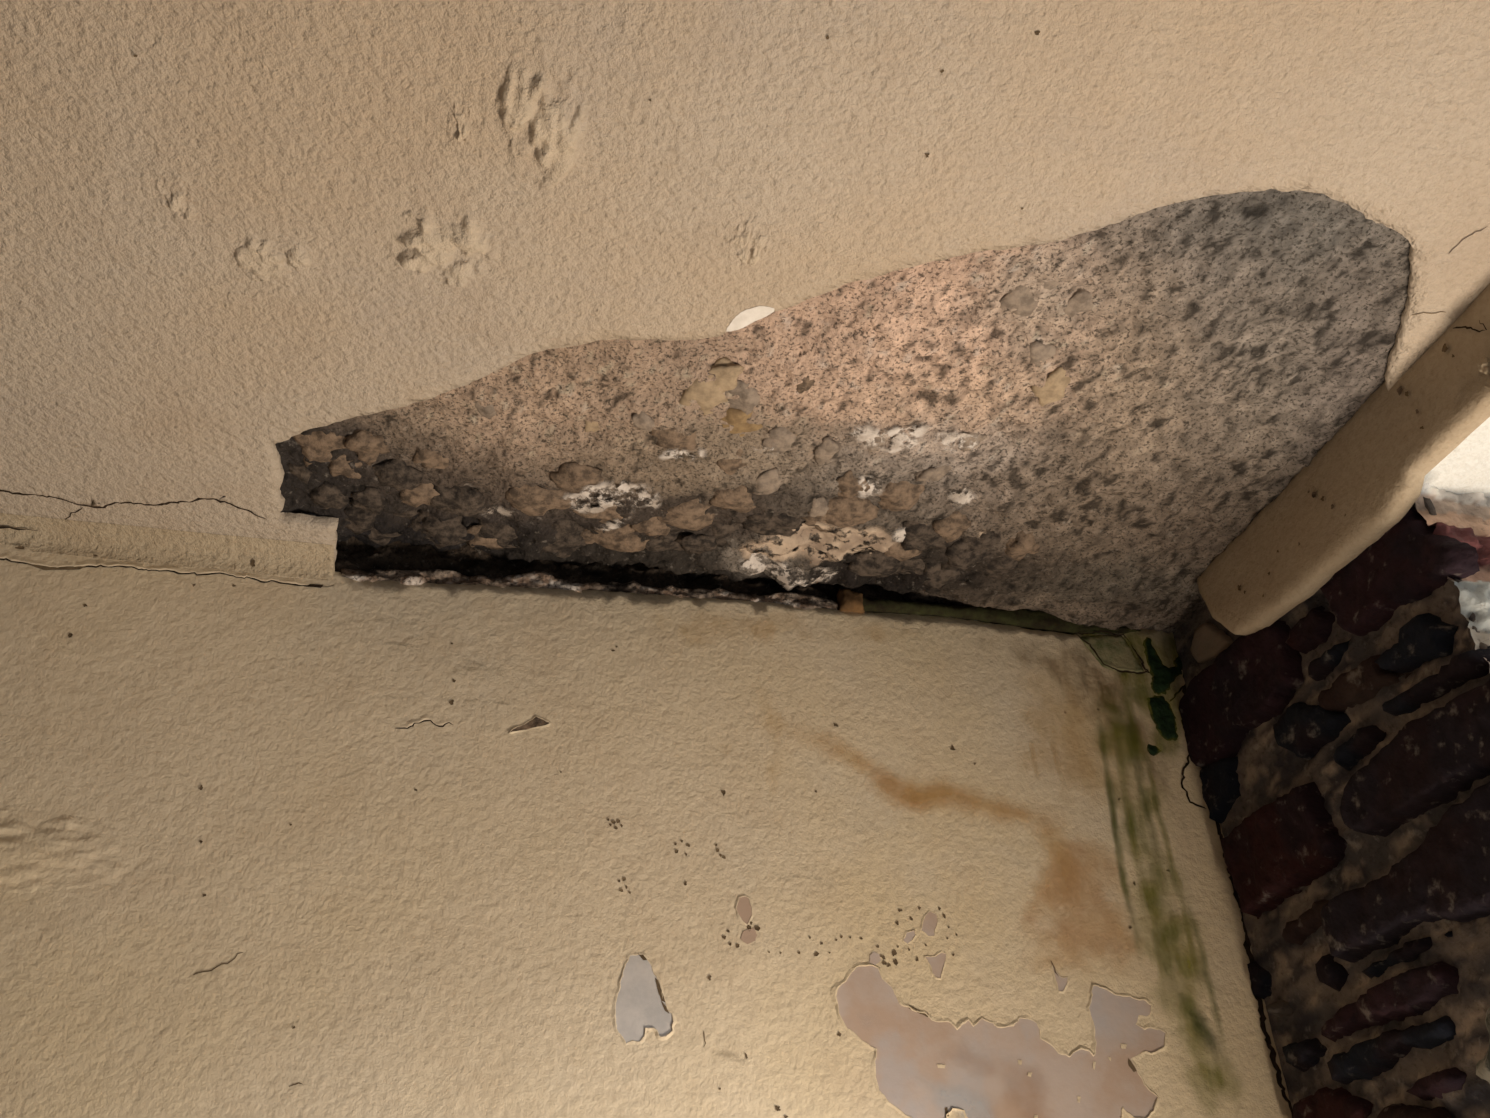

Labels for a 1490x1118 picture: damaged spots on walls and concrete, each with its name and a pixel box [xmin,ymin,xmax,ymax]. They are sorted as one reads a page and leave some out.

crack [0,482,334,588]
spalling [275,189,1411,672]
peeling [612,951,677,1046]
peeling [722,894,1168,1118]